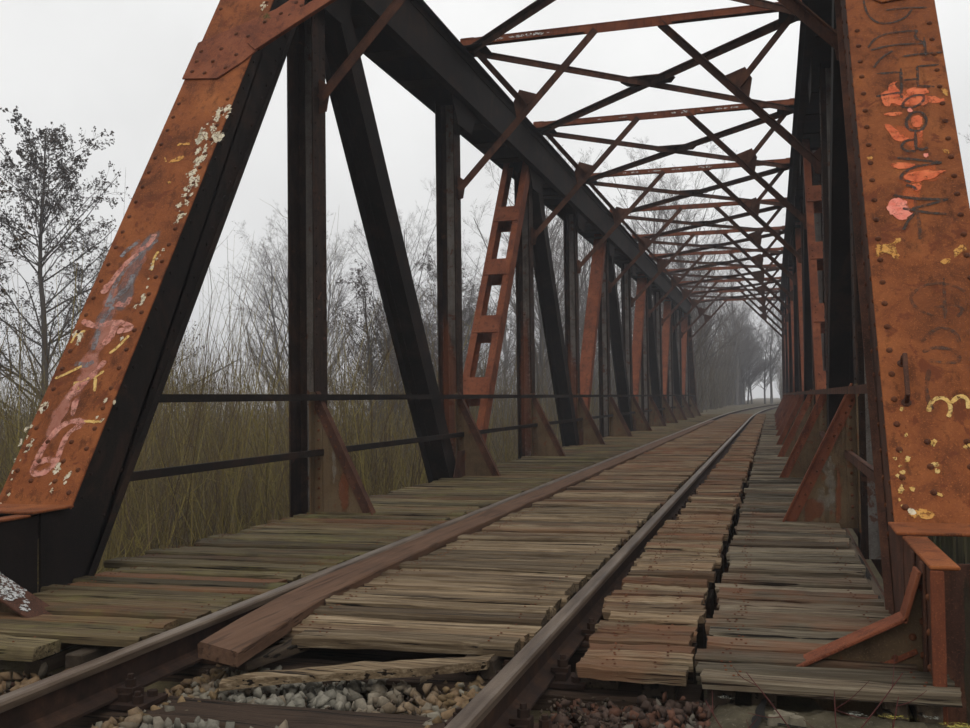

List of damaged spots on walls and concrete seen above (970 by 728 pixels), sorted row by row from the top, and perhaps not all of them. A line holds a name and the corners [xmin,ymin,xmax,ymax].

peeling [164,104,232,224]
peeling [49,463,72,492]
peeling [893,456,935,520]
crack [750,699,805,728]